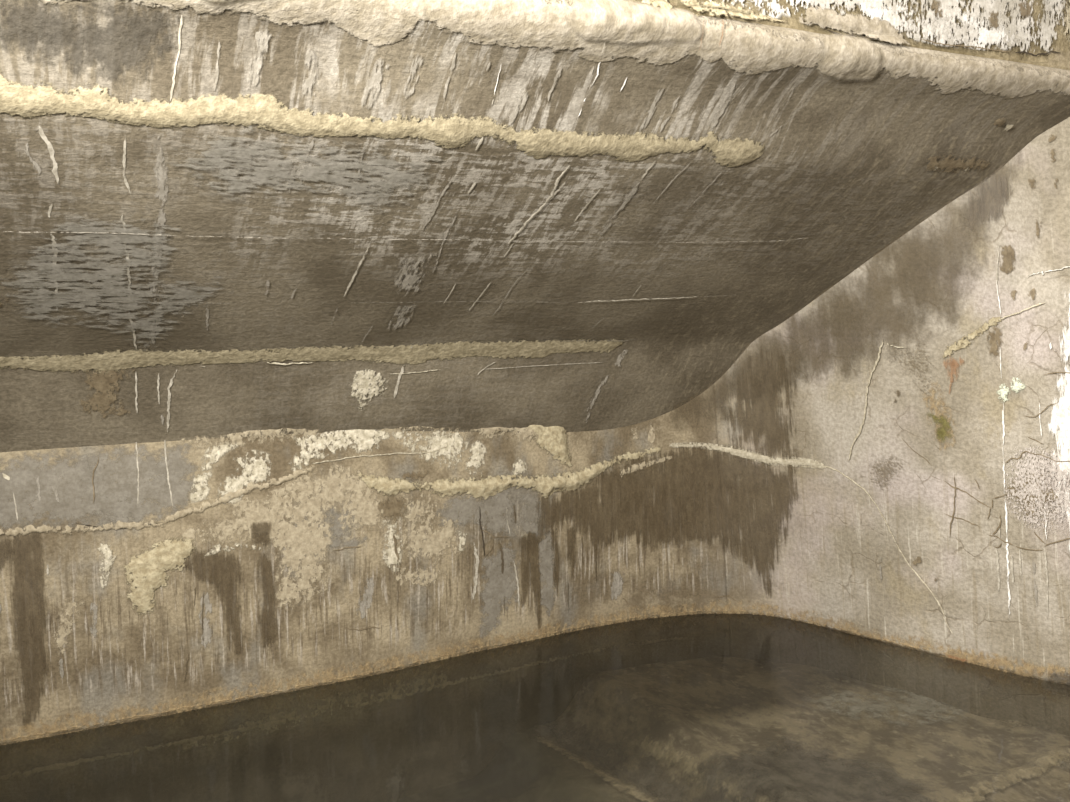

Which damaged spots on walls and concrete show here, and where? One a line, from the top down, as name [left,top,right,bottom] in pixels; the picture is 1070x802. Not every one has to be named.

peeling [119,0,1070,99]
water stain [24,126,59,184]
water stain [122,140,131,194]
water stain [0,161,1070,780]
crack [903,440,1070,551]
crack [1005,401,1070,464]
peeling [182,465,555,638]